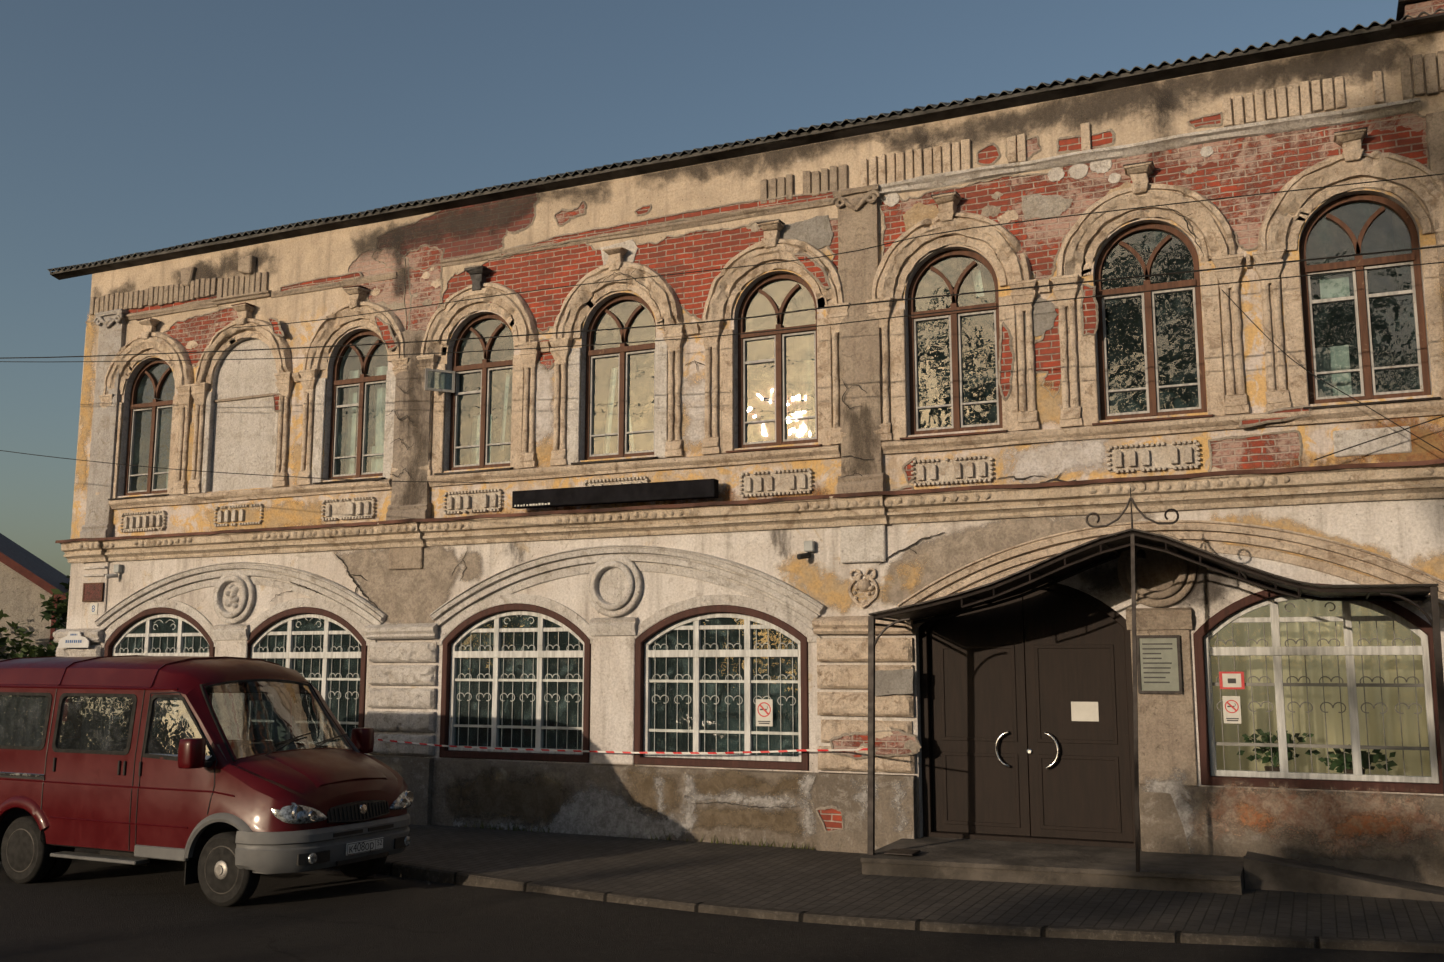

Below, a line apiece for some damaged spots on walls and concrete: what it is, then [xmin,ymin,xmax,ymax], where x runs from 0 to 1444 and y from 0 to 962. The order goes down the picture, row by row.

flaking render [879,112,1430,281]
flaking render [128,291,238,367]
flaking render [280,190,838,445]
leakage [846,407,871,475]
flaking render [1208,405,1312,472]
crack [270,555,378,608]
flaking render [815,805,845,833]